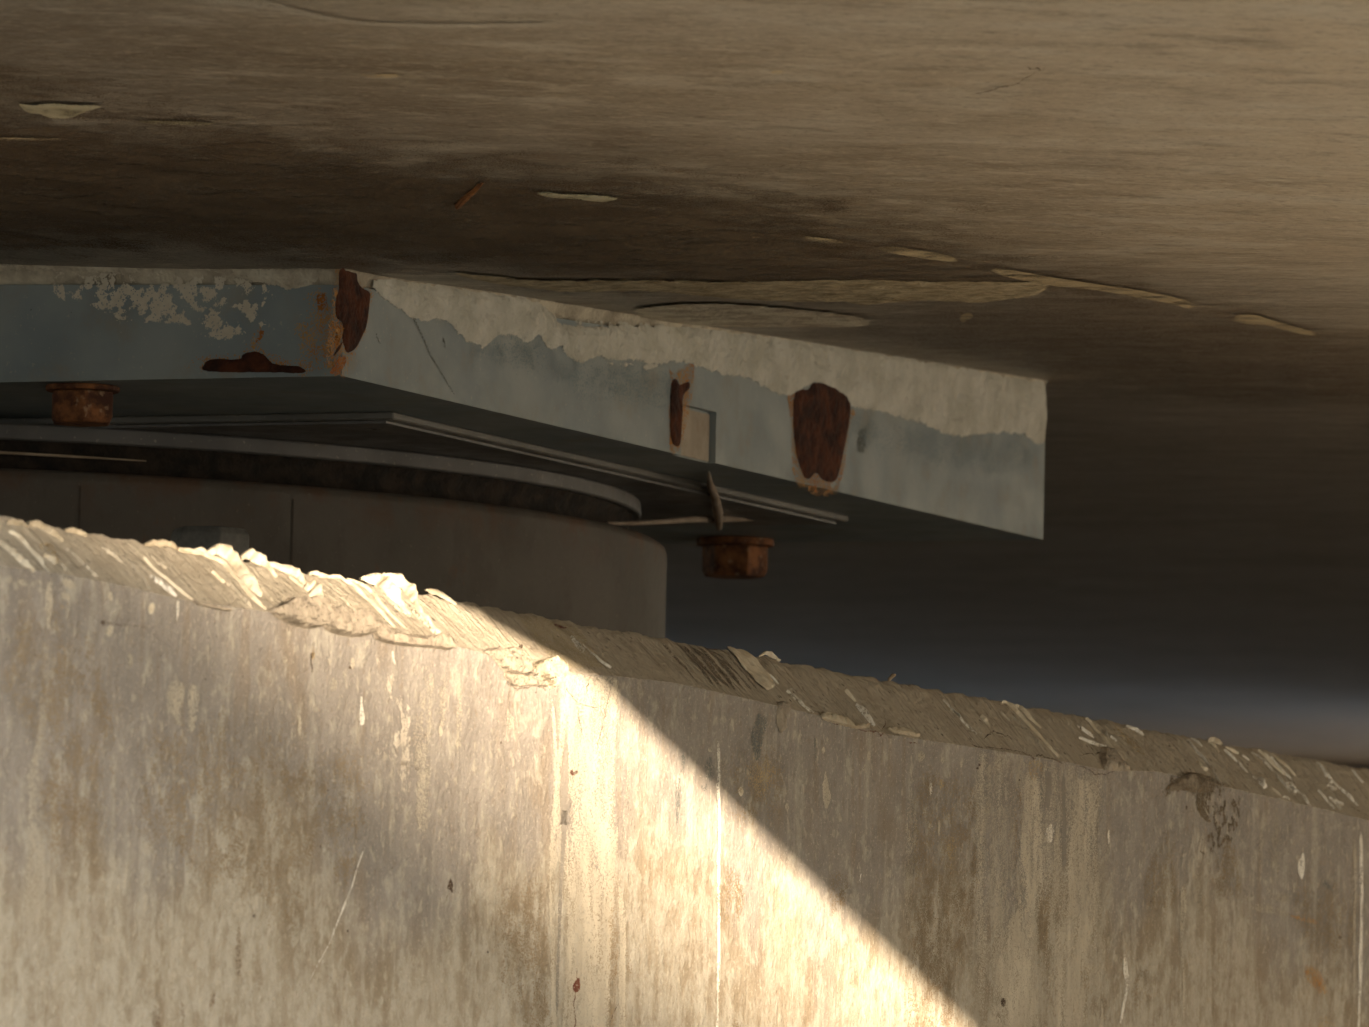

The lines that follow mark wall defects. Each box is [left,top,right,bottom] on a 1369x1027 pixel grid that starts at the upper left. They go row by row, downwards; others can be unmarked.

peeling [0,264,322,340]
rust [186,268,374,378]
peeling [450,272,1051,327]
rust [669,364,695,454]
rust [787,383,856,497]
spalling [268,595,457,650]
spalling [483,644,569,693]
water stain [0,519,462,943]
water stain [491,615,647,1027]
water stain [701,714,789,1027]
water stain [903,699,1151,1027]
water stain [1187,737,1364,810]